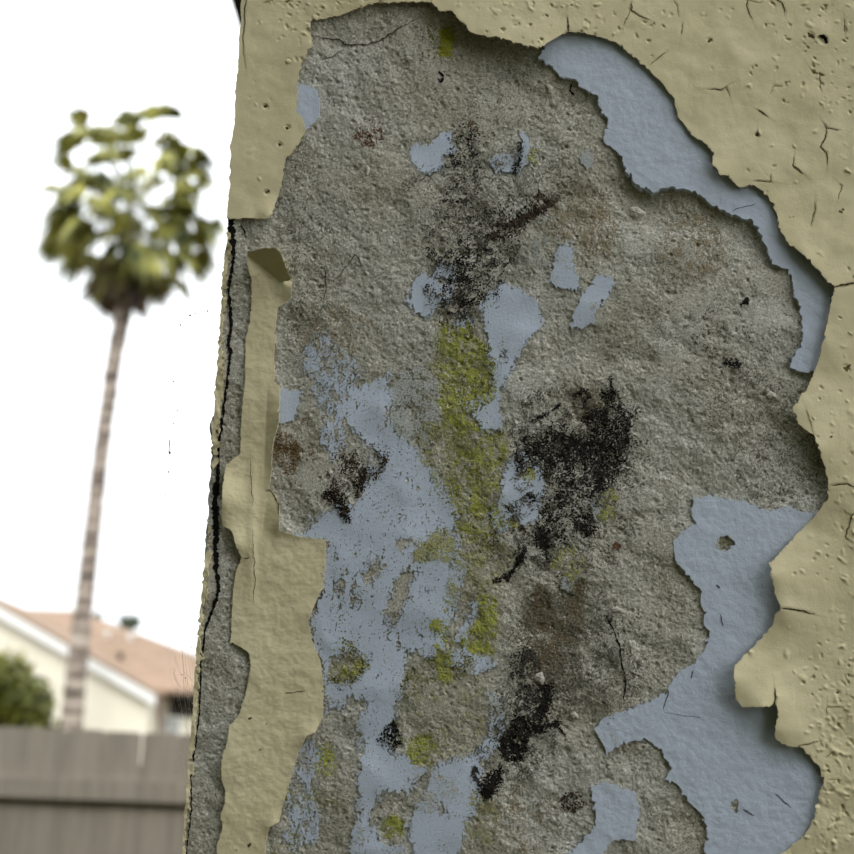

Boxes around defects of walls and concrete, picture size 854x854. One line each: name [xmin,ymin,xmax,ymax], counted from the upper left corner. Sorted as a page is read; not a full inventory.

leakage [275,108,452,394]
leakage [393,8,630,334]
leakage [652,195,735,295]
crack [186,220,247,854]
leakage [314,442,395,524]
spalling [182,2,830,854]
leakage [397,285,828,854]
leakage [302,690,436,854]